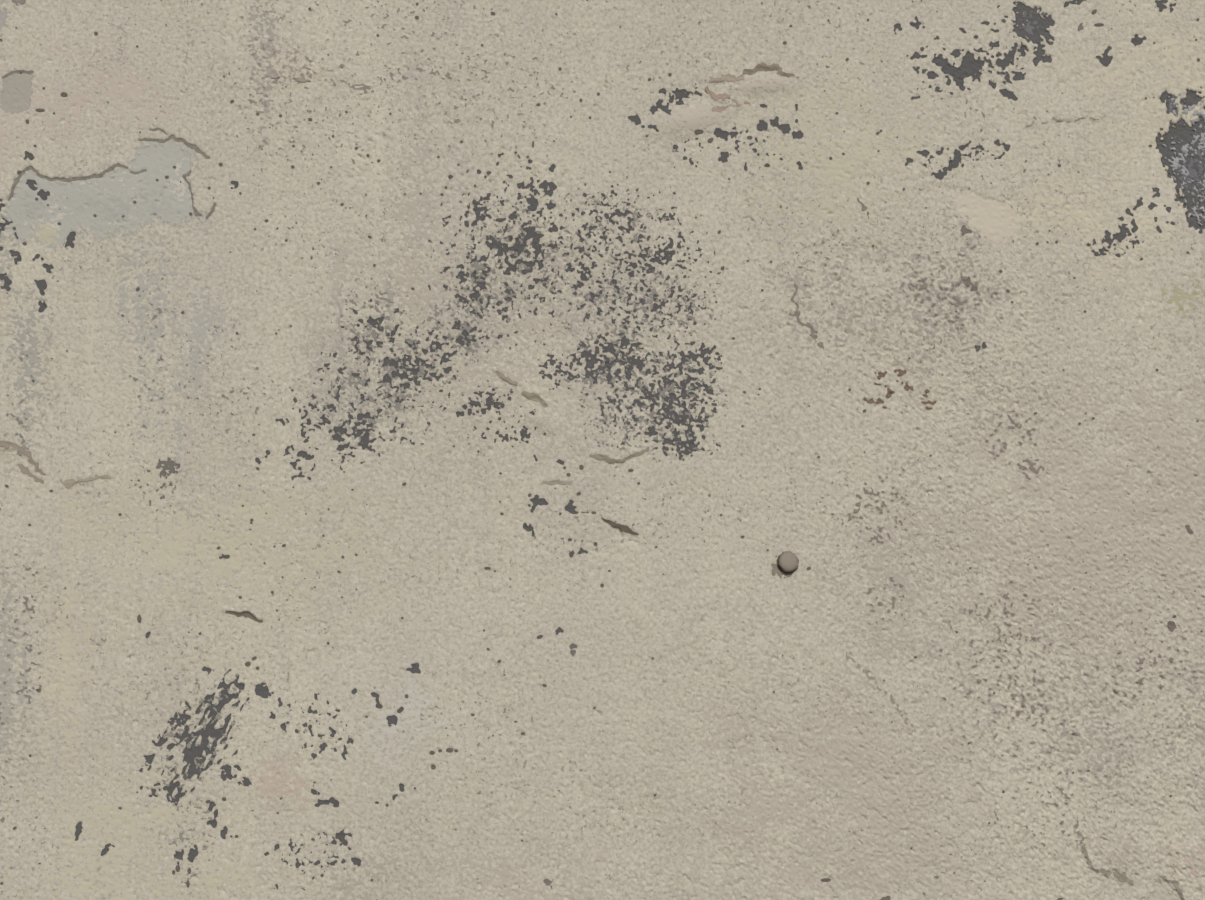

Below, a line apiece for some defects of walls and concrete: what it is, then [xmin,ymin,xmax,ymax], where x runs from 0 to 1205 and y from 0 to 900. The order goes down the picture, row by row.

spalling [894,1,1055,103]
peeling [26,179,50,200]
peeling [628,83,707,132]
peeling [714,104,804,170]
peeling [905,139,1010,180]
spalling [1087,87,1205,262]
peeling [0,199,54,312]
peeling [65,231,76,248]
peeling [255,141,731,480]
peeling [351,687,404,725]
peeling [136,666,354,883]
peeling [264,829,361,890]